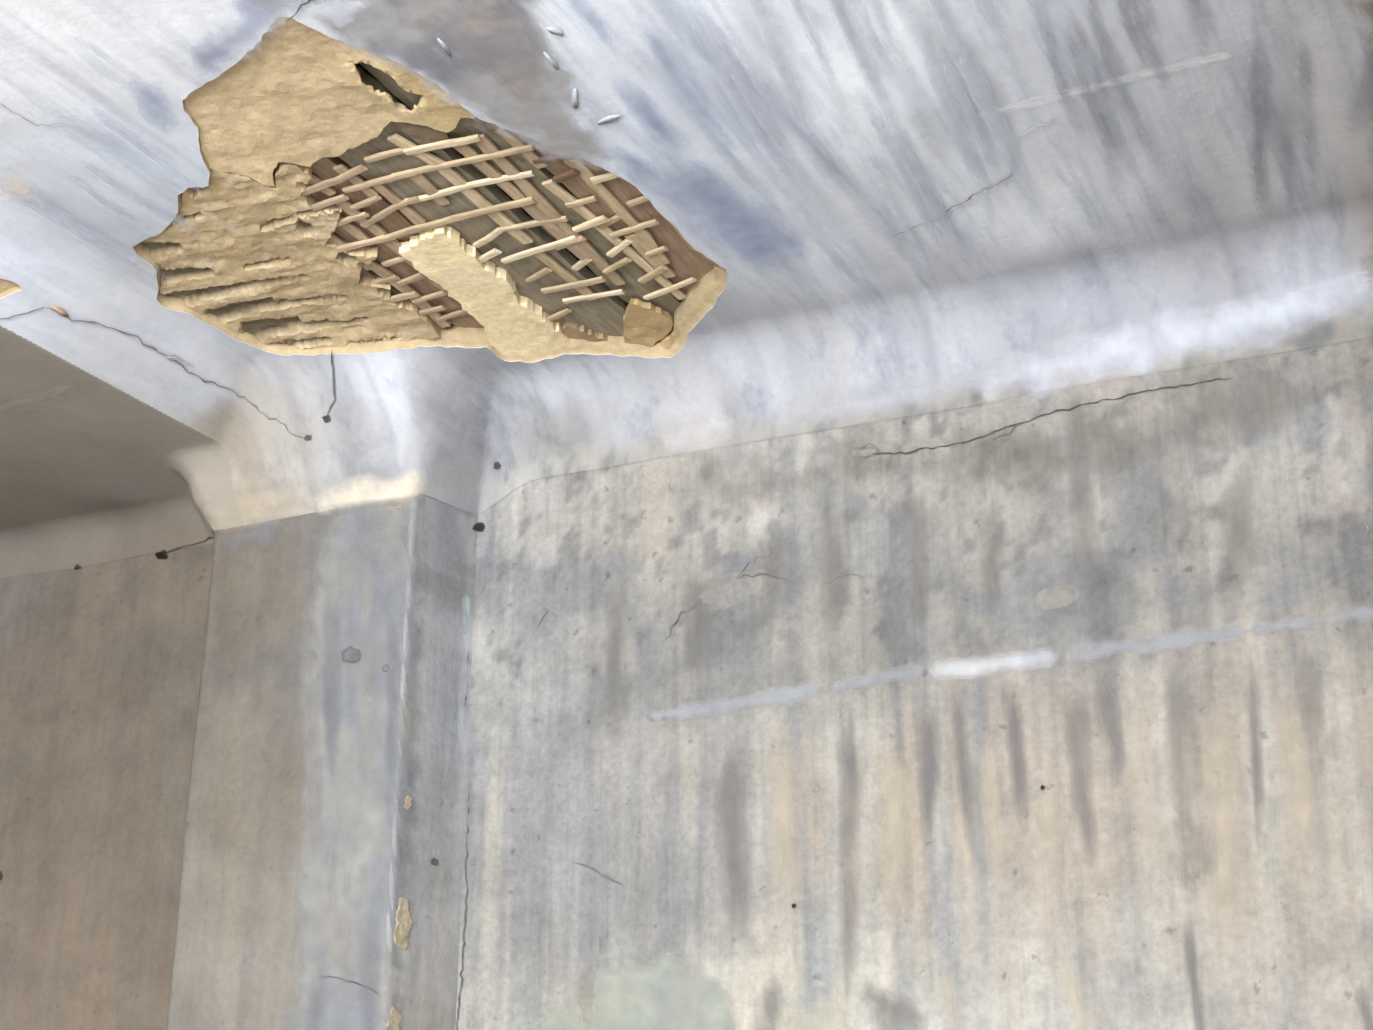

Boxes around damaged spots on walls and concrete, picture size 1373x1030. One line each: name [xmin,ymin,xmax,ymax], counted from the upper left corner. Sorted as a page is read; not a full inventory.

spalling [133,0,727,362]
water stain [624,93,677,143]
water stain [625,156,799,264]
spalling [0,278,22,298]
crack [0,305,336,440]
water stain [920,720,938,822]
water stain [1007,702,1025,807]
water stain [1067,679,1121,850]
water stain [1248,686,1261,812]
water stain [718,763,746,909]
water stain [841,739,858,960]
water stain [1185,934,1203,1030]